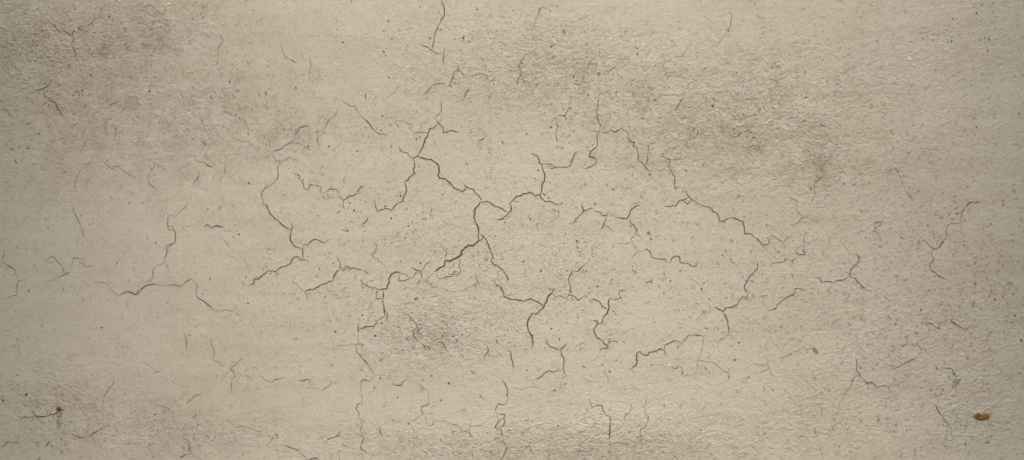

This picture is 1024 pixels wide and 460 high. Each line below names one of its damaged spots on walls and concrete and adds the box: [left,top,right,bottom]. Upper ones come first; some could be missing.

crack [101,226,212,309]
crack [249,0,805,460]
crack [771,251,865,310]
crack [925,200,980,281]
crack [854,357,878,388]